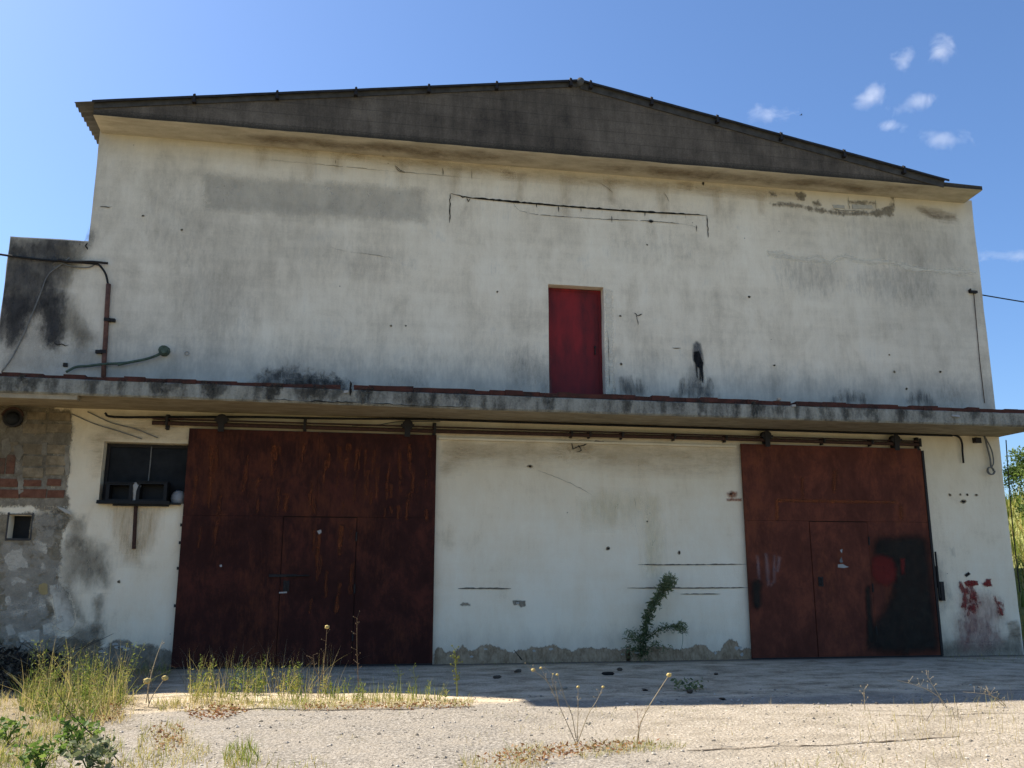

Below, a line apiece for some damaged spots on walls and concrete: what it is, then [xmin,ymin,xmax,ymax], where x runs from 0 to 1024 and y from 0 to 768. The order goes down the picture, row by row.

crack [277,160,709,237]
flaking render [770,192,895,217]
leakage [0,239,88,344]
leakage [257,368,365,404]
flaking render [0,406,172,671]
flaking render [434,639,752,664]